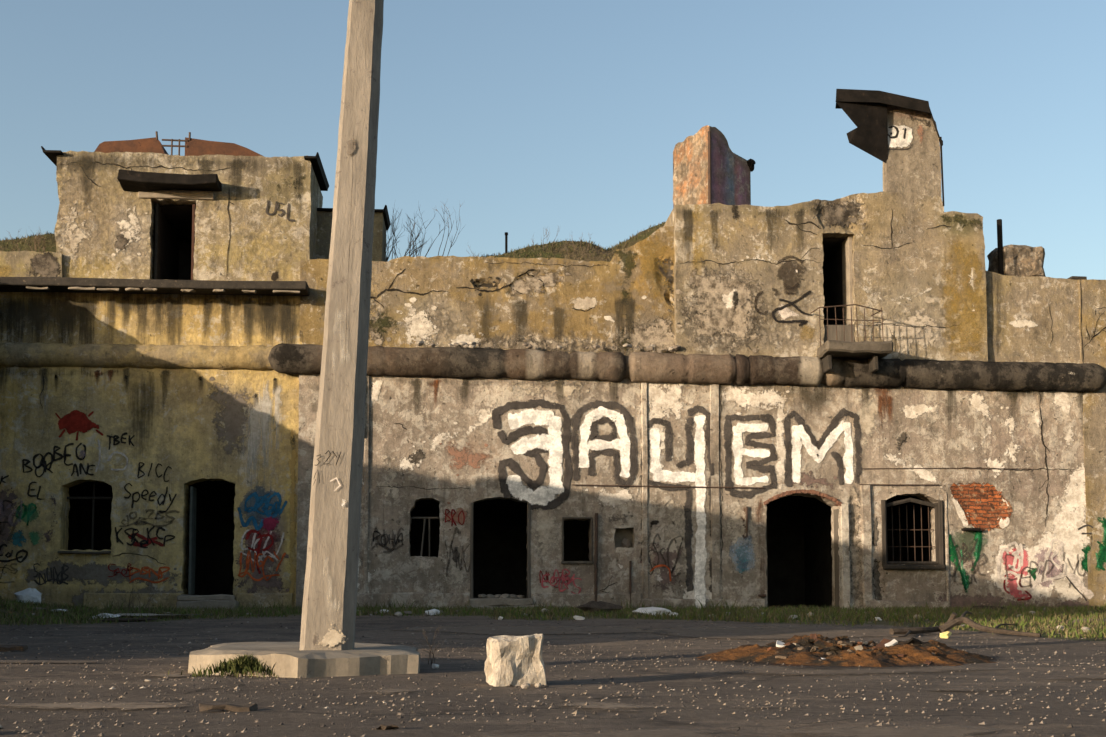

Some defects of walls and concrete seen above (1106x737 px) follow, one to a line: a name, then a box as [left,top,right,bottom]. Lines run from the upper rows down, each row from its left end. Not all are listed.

spalling [26,200,92,290]
spalling [114,230,129,250]
crack [60,161,233,279]
crack [345,141,608,362]
crack [863,210,951,249]
damp [967,266,978,311]
damp [0,297,94,344]
damp [108,295,181,338]
damp [203,296,303,344]
crack [952,393,1082,526]
peeling [849,389,1093,609]